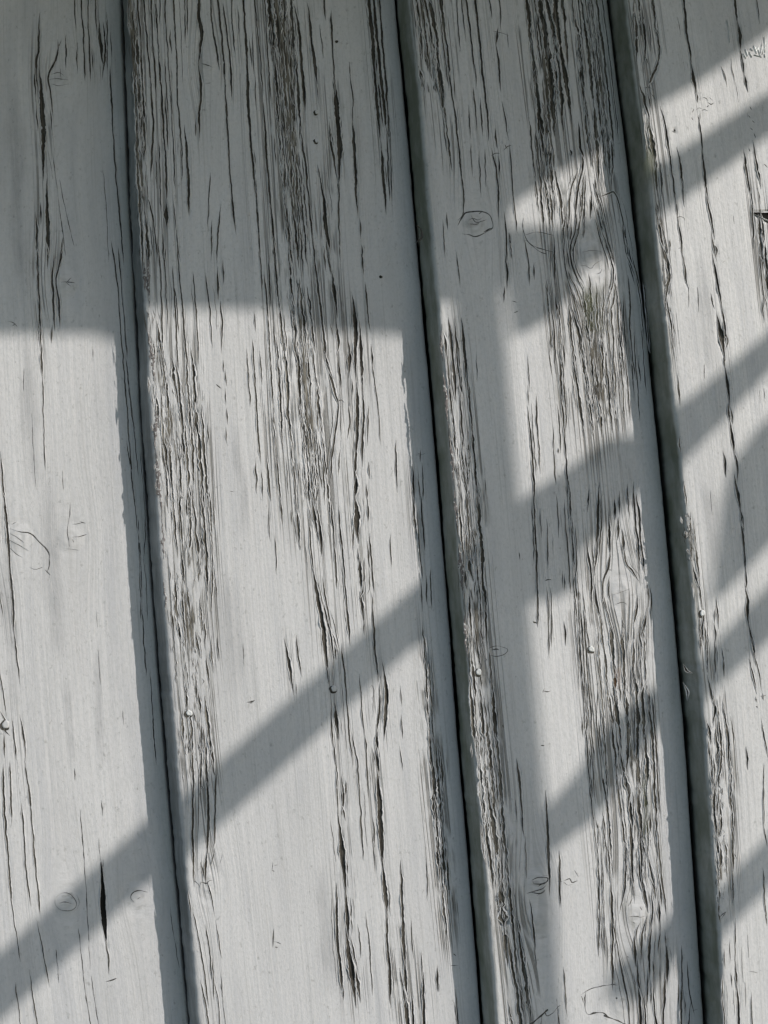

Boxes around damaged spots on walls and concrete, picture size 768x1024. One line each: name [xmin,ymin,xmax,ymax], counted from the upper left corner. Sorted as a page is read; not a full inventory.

crack [0,0,157,1024]
peeling [127,0,220,789]
peeling [266,0,331,514]
peeling [421,622,454,942]
peeling [443,373,532,1024]
peeling [546,271,625,439]
peeling [597,612,661,896]
peeling [632,0,675,353]
peeling [680,483,736,923]